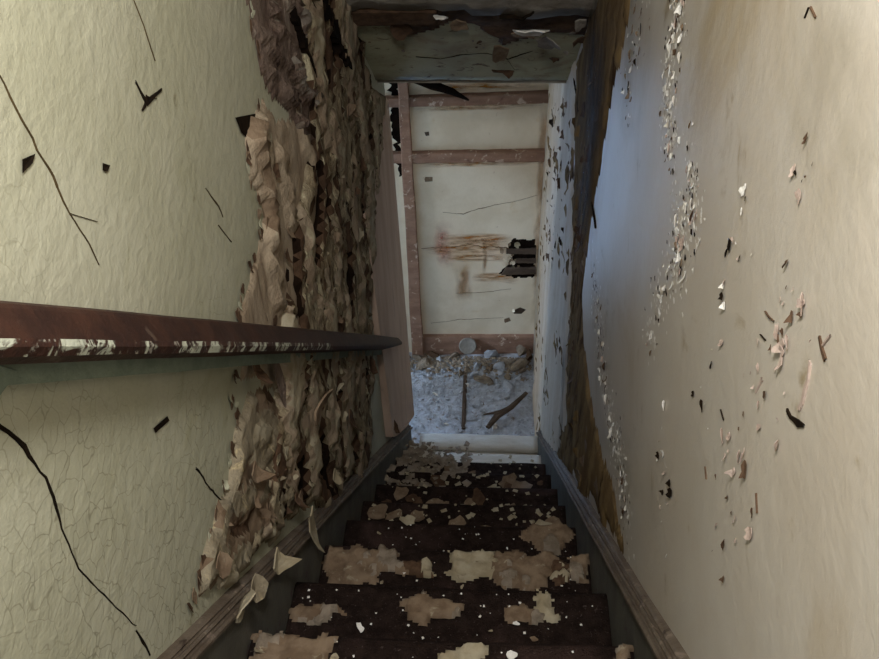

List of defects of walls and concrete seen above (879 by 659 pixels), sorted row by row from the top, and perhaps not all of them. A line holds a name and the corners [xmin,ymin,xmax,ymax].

crack [0,75,100,265]
peeling [642,0,705,365]
crack [0,424,151,656]
peeling [187,351,590,626]
peeling [235,0,650,560]
peeling [704,409,747,480]
peeling [720,493,758,550]
peeling [756,285,805,371]
spalling [776,360,812,427]
spalling [809,334,832,362]